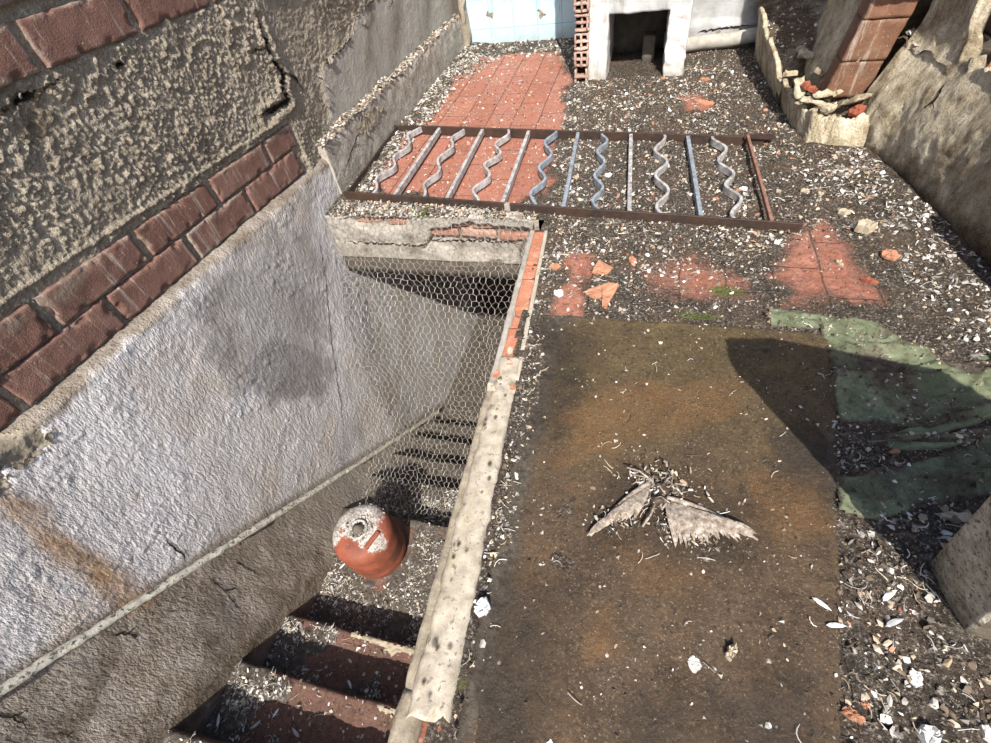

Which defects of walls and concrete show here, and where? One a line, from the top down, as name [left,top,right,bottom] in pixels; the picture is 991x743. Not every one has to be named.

crack [251,0,393,116]
crack [0,77,72,114]
crack [922,82,946,112]